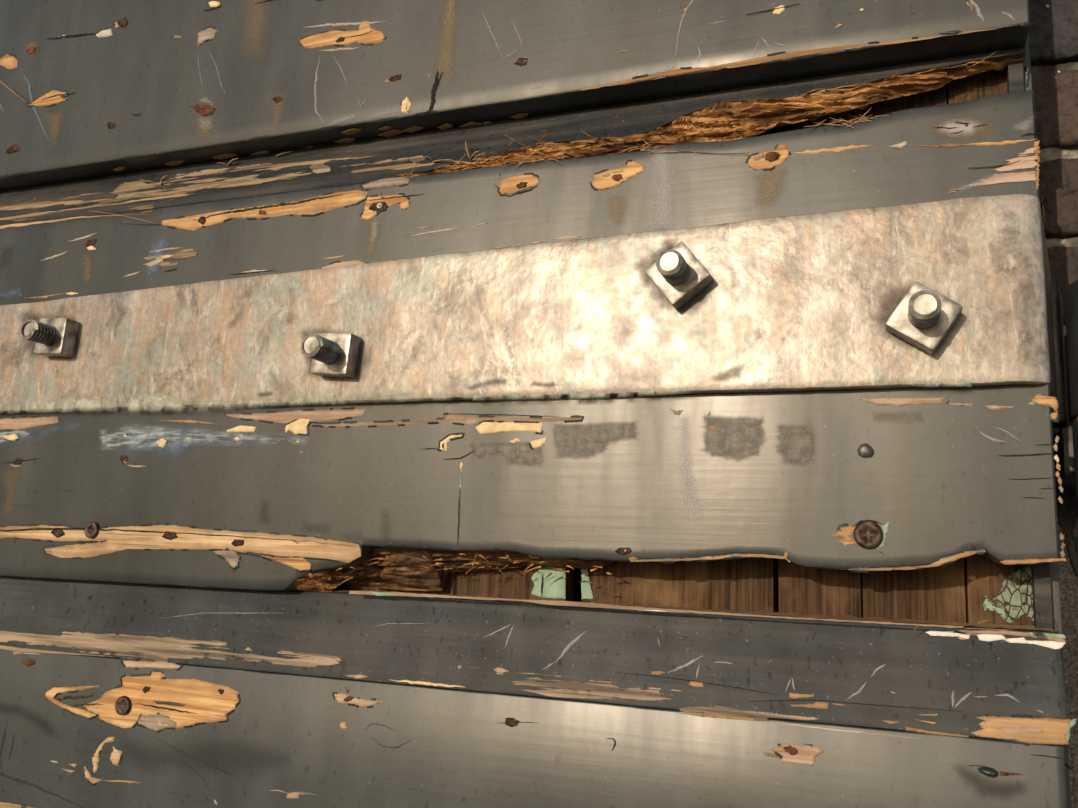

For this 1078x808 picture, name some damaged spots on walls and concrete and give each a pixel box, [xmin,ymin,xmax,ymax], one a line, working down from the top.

crack [406,69,442,117]
spalling [0,0,1041,231]
crack [654,149,752,157]
crack [793,121,1037,154]
peeling [0,416,58,442]
peeling [158,407,584,459]
peeling [1029,394,1060,422]
peeling [1053,435,1064,504]
spalling [0,522,1067,649]
spalling [0,631,341,786]
peeling [389,679,463,687]
peeling [494,667,1077,746]